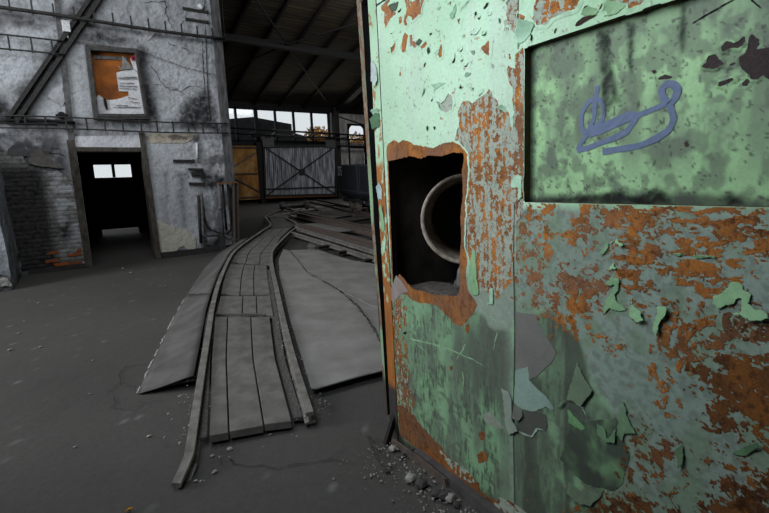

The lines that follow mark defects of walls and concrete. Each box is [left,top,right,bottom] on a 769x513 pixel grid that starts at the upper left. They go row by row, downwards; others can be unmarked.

crack [145,0,205,92]
peeling [380,0,439,67]
peeling [421,45,475,116]
peeling [474,0,534,62]
rust [530,0,649,31]
flaking render [0,144,84,271]
flaking render [0,274,12,287]
peeling [484,363,629,491]